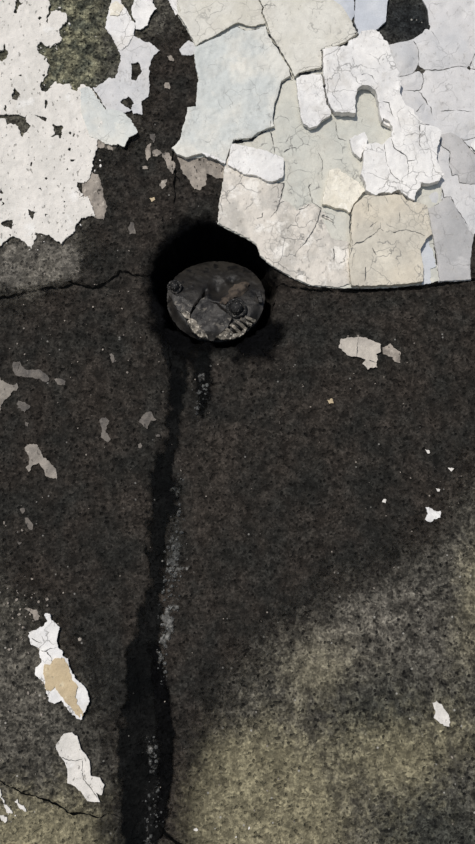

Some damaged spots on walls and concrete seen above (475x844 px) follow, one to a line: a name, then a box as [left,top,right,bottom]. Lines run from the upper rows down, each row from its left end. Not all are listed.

peeling [0,0,475,289]
crack [0,270,156,299]
peeling [339,335,401,370]
peeling [0,362,65,412]
damp [0,24,272,844]
peeling [25,444,57,479]
damp [158,234,475,844]
peeling [25,608,90,720]
peeling [56,732,105,802]
peeling [0,789,26,823]
crack [156,825,181,844]